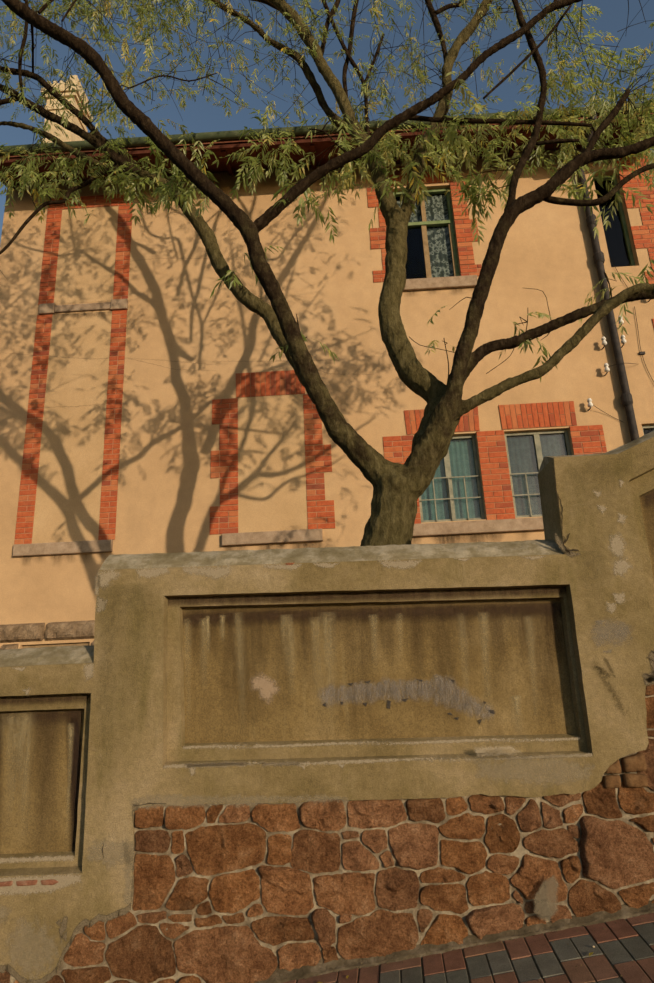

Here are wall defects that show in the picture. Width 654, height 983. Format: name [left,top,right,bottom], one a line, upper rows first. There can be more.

spalling [642,650,654,685]
peeling [252,676,279,700]
spalling [603,753,648,789]